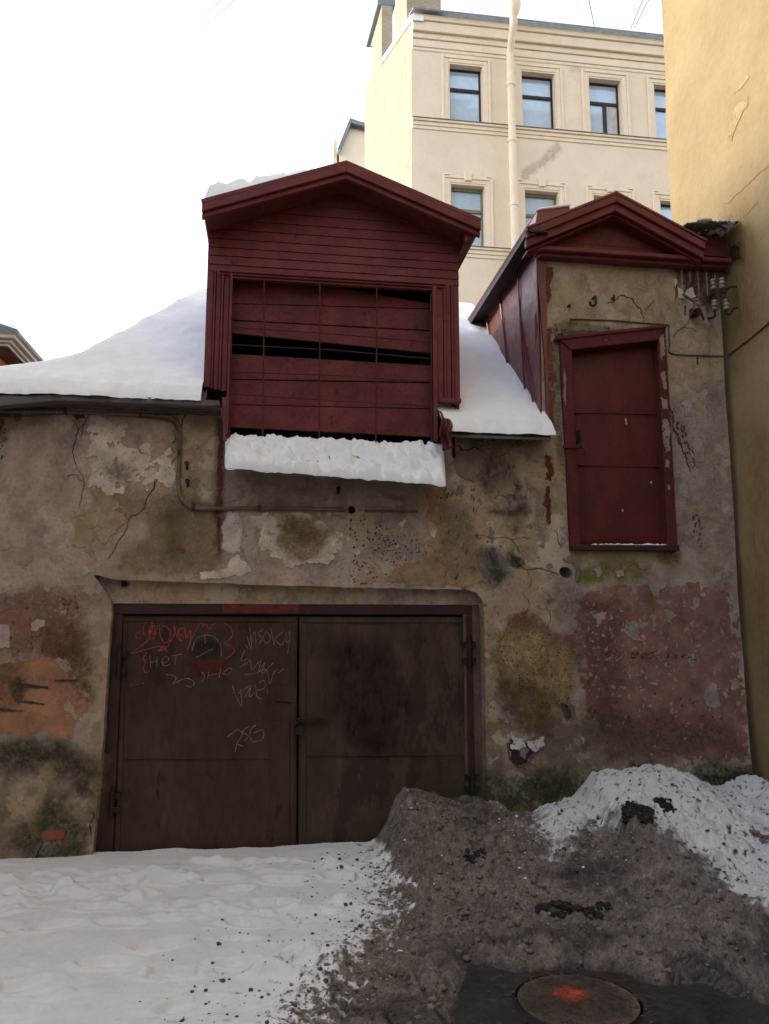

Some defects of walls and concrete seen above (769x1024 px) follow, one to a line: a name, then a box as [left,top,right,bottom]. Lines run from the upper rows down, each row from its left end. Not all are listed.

crack [71,416,89,505]
peeling [66,415,176,560]
crack [108,415,185,558]
peeling [200,511,430,585]
damp [471,548,523,586]
crack [473,535,568,631]
peeling [659,334,704,500]
peeling [0,587,100,748]
peeling [505,562,749,768]
mould [0,740,102,795]